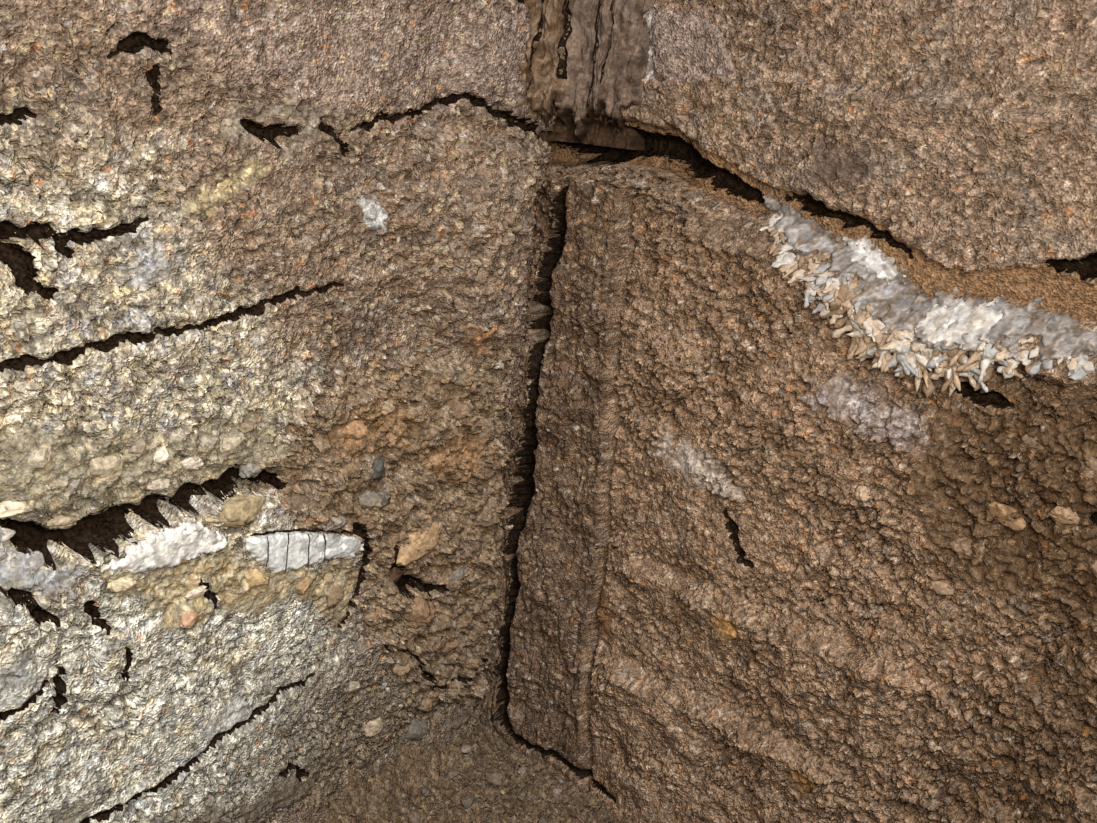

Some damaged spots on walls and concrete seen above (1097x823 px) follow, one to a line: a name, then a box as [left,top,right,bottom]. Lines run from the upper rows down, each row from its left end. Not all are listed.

crack [107,32,172,115]
crack [0,216,149,300]
crack [0,281,345,373]
damp [759,193,1097,397]
crack [1045,251,1097,281]
crack [240,0,914,803]
crack [0,464,288,571]
damp [101,521,228,575]
damp [243,527,364,573]
crack [0,586,133,682]
crack [0,666,68,721]
crack [79,673,315,823]